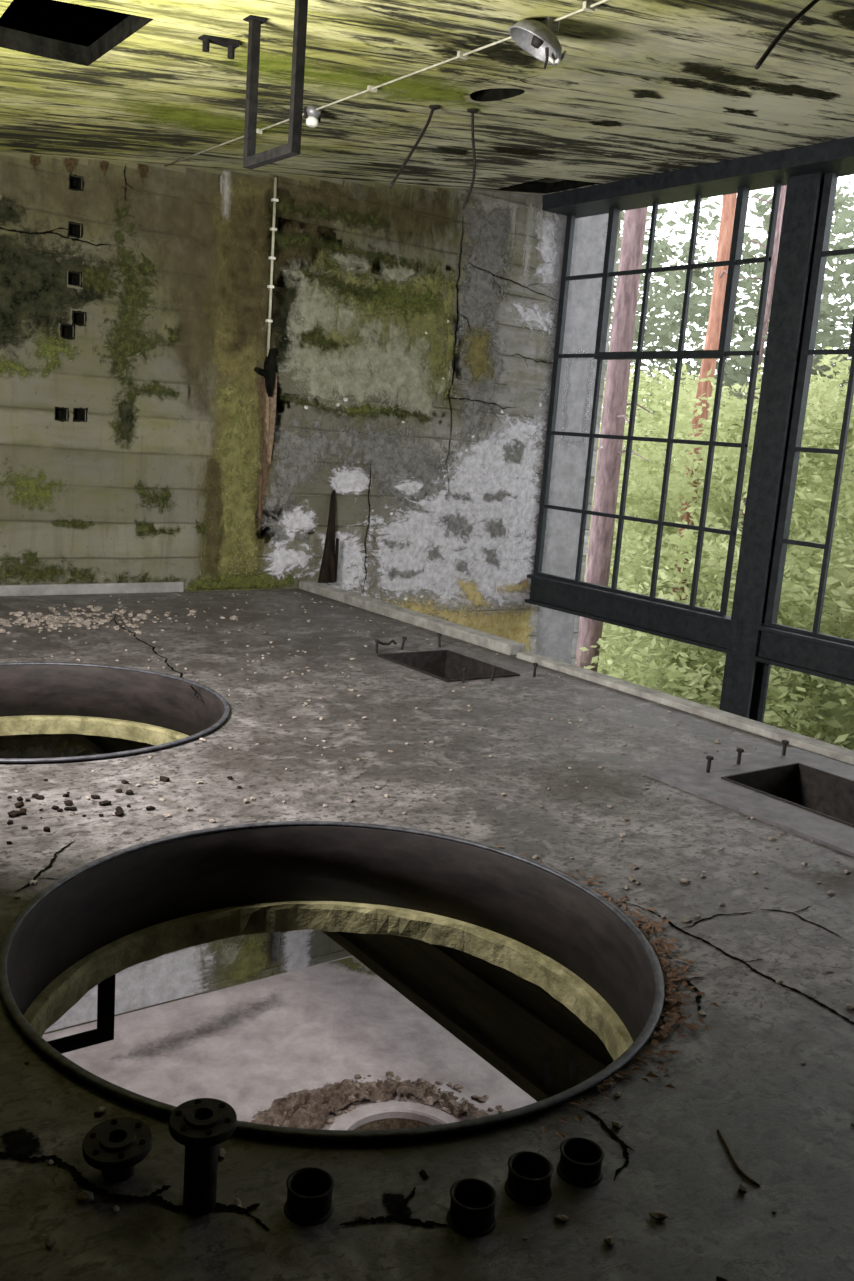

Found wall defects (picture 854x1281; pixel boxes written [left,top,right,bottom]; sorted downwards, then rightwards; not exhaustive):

damp [796,9,854,31]
damp [425,33,551,73]
damp [630,62,841,117]
damp [136,102,289,134]
damp [436,146,470,155]
damp [491,146,562,156]
damp [0,196,117,378]
damp [30,155,543,590]
peeling [263,210,613,664]
damp [23,551,39,565]
crack [622,900,854,1024]
crack [0,1152,270,1231]